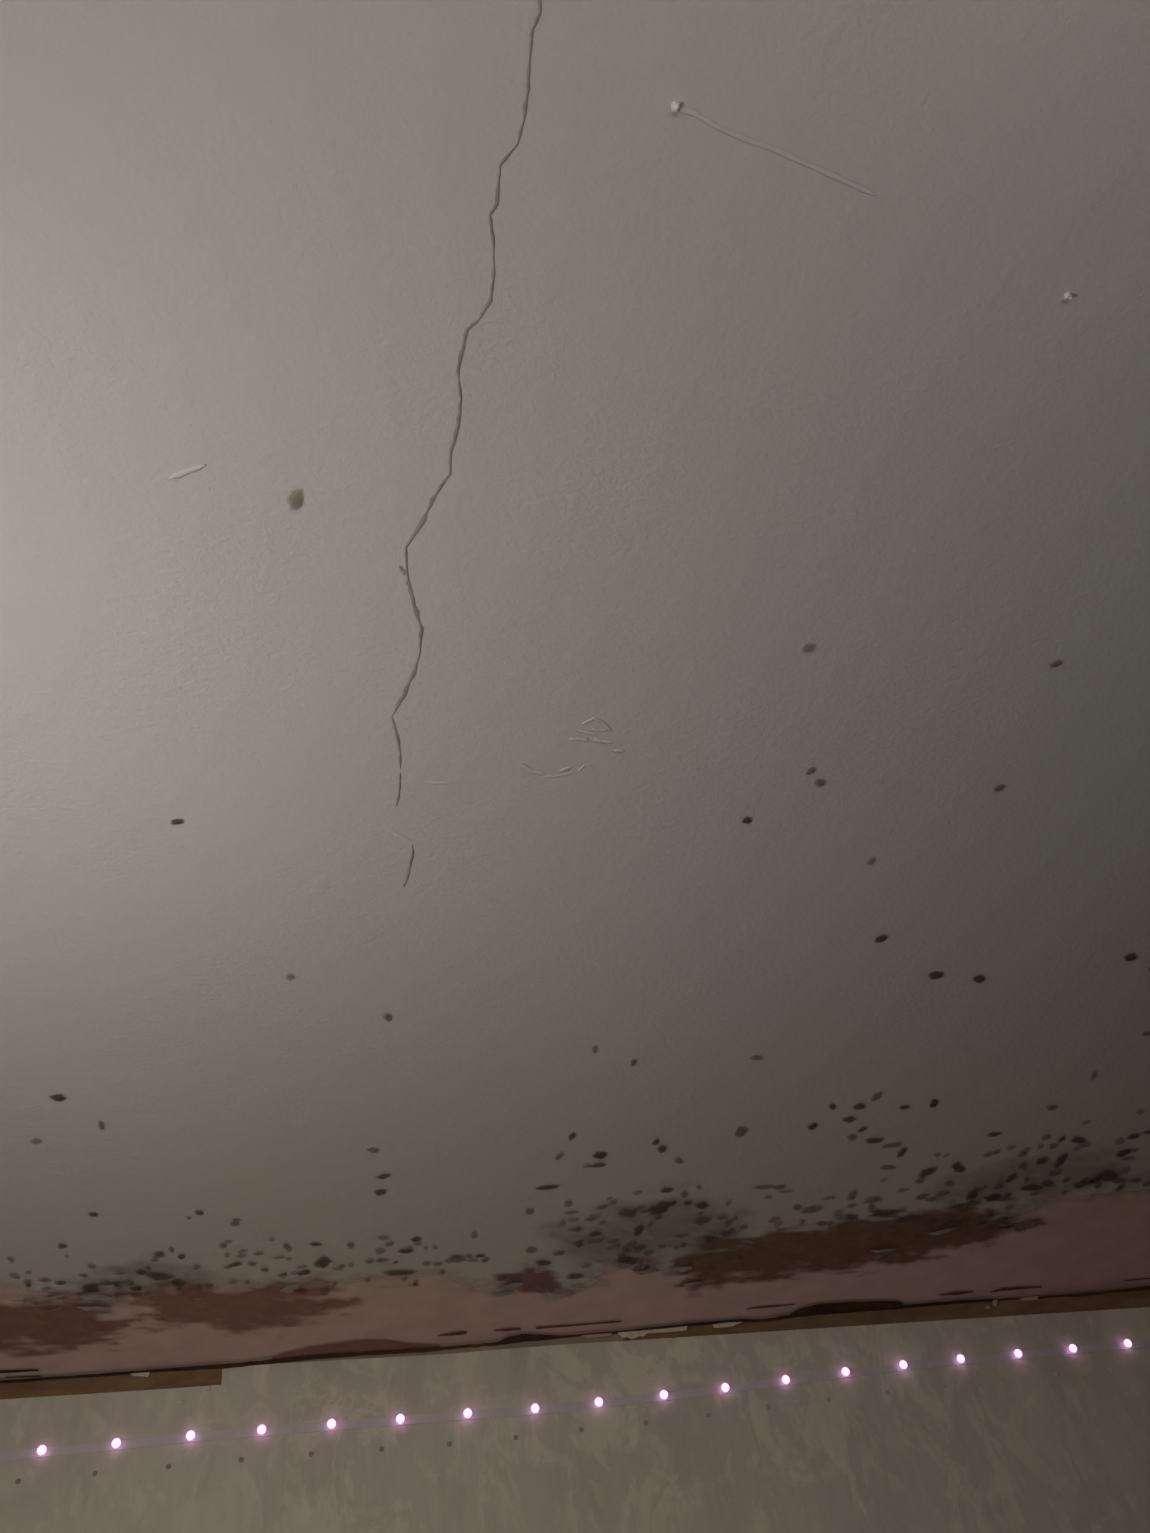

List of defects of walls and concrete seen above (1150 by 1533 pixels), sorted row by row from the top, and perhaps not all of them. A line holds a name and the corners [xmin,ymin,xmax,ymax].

crack [391,0,542,806]
crack [403,845,414,887]
damp [829,1104,883,1143]
damp [591,1152,606,1168]
damp [919,1162,965,1176]
damp [1037,1136,1085,1168]
damp [1089,1131,1150,1184]
damp [634,1188,708,1235]
damp [674,1174,1043,1288]
damp [497,1260,582,1292]
damp [0,1243,358,1356]